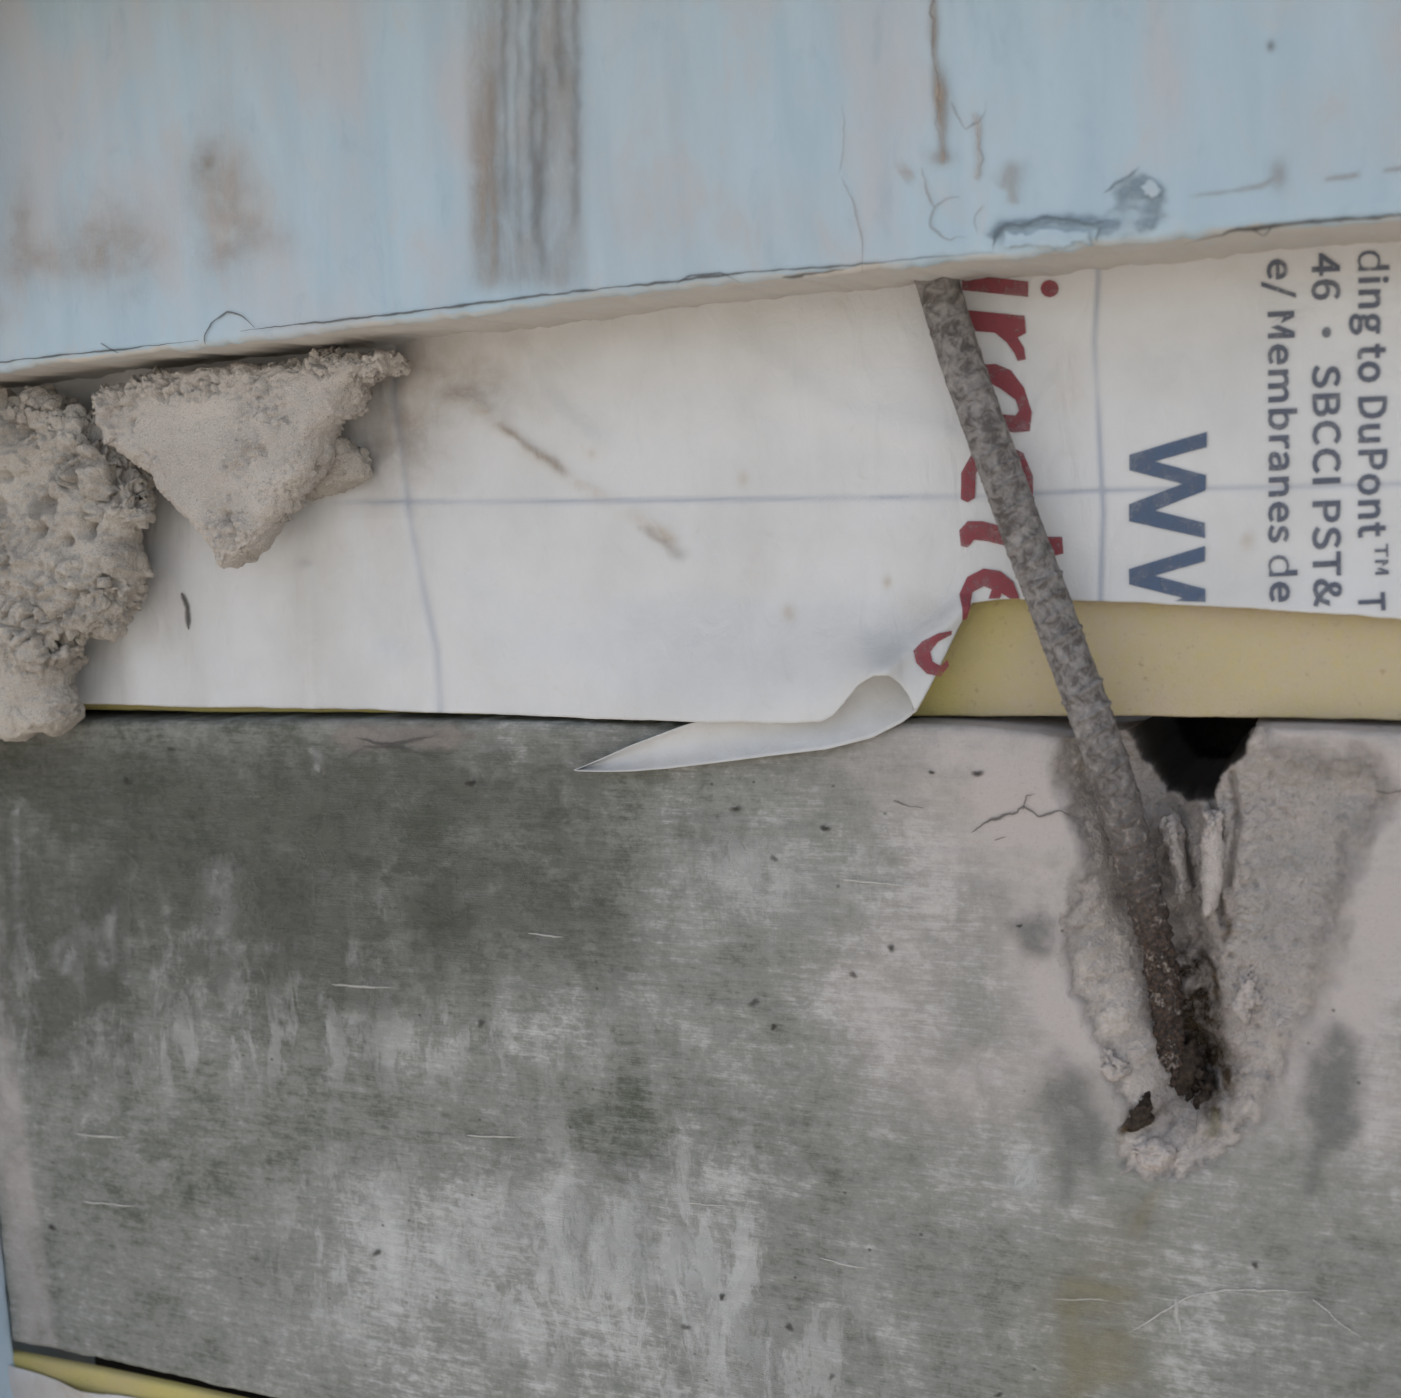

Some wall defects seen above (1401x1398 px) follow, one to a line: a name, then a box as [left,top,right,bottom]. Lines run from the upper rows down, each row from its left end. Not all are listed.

rust [934,76,945,162]
peeling [990,167,1162,250]
spalling [1058,716,1393,1181]